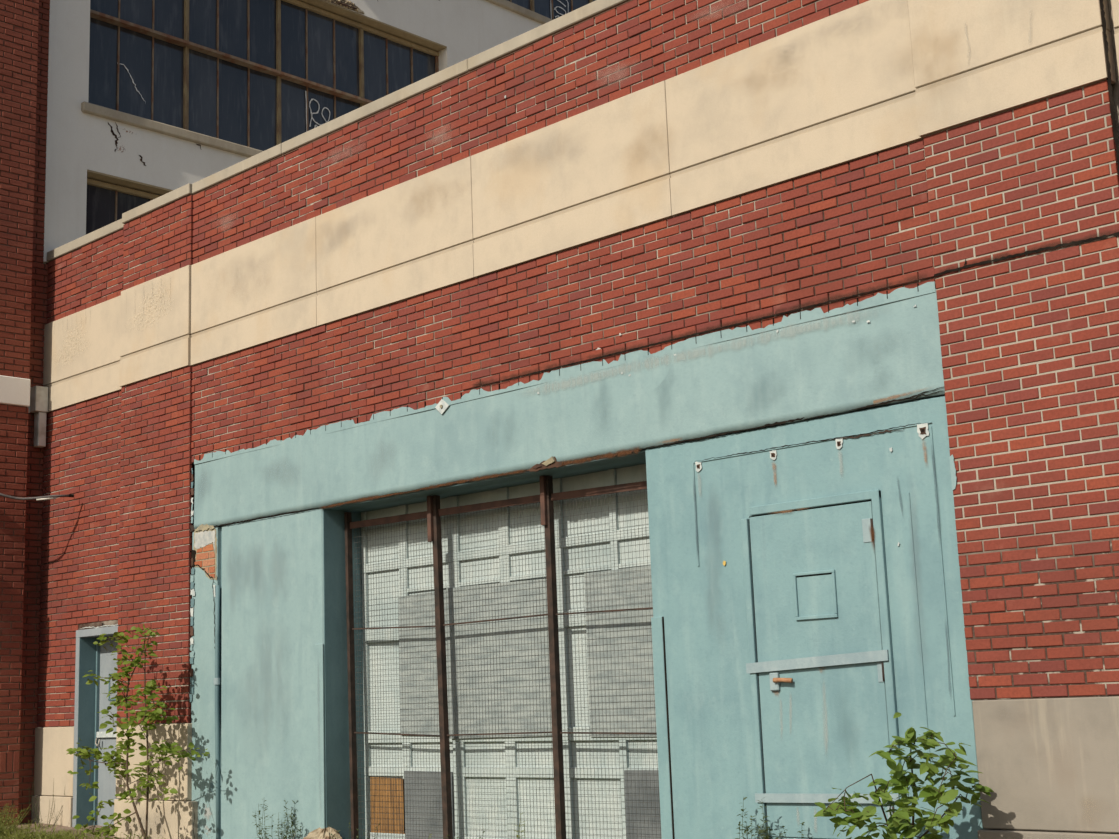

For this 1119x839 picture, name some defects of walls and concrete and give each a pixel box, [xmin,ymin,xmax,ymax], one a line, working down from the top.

crack [1100,0,1119,174]
crack [475,232,1119,385]
spalling [527,456,562,472]
flaking render [189,468,217,702]